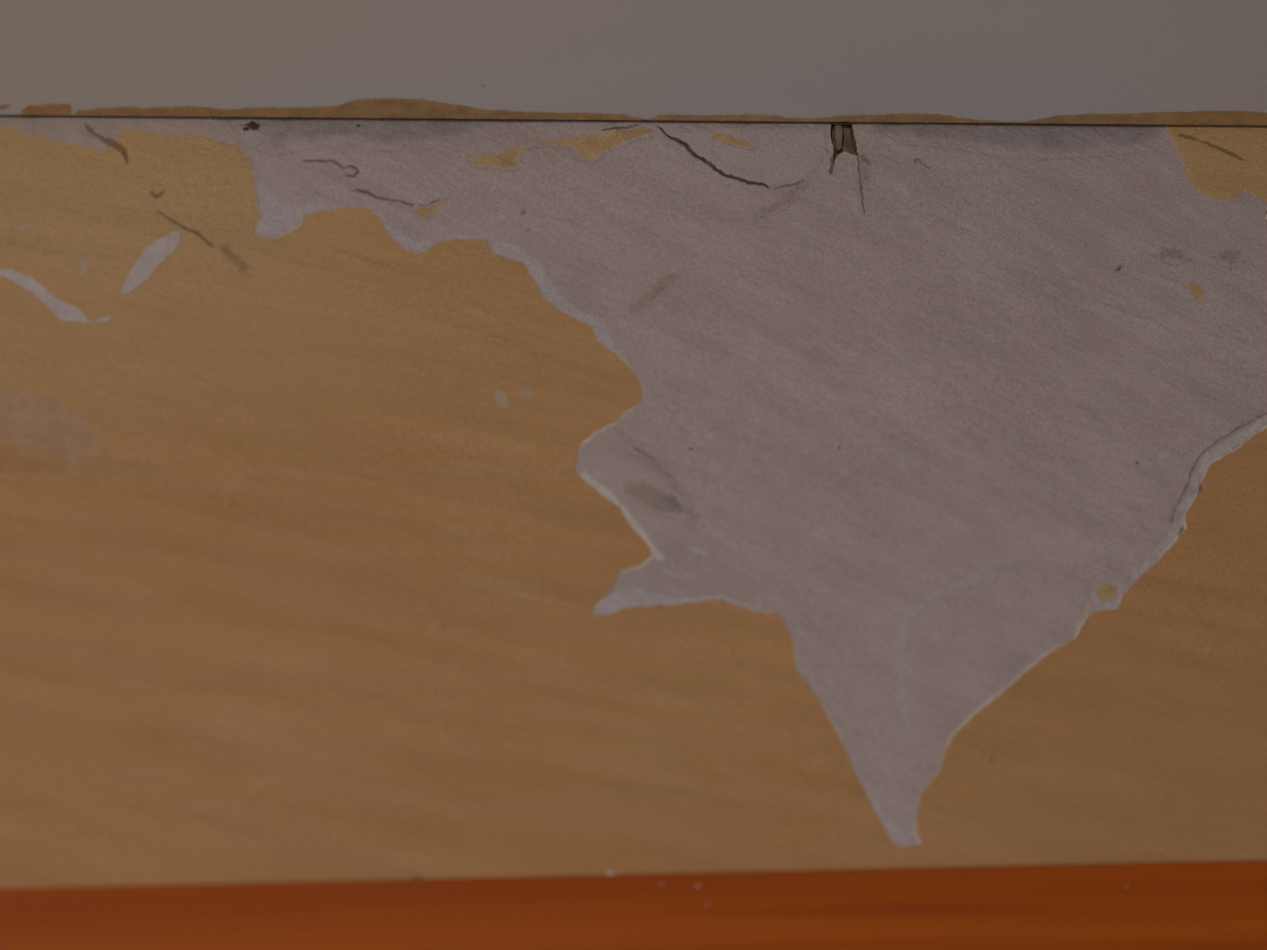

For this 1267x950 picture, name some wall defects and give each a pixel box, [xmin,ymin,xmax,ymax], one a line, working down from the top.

crack [0,116,1267,188]
peeling [0,115,1267,847]